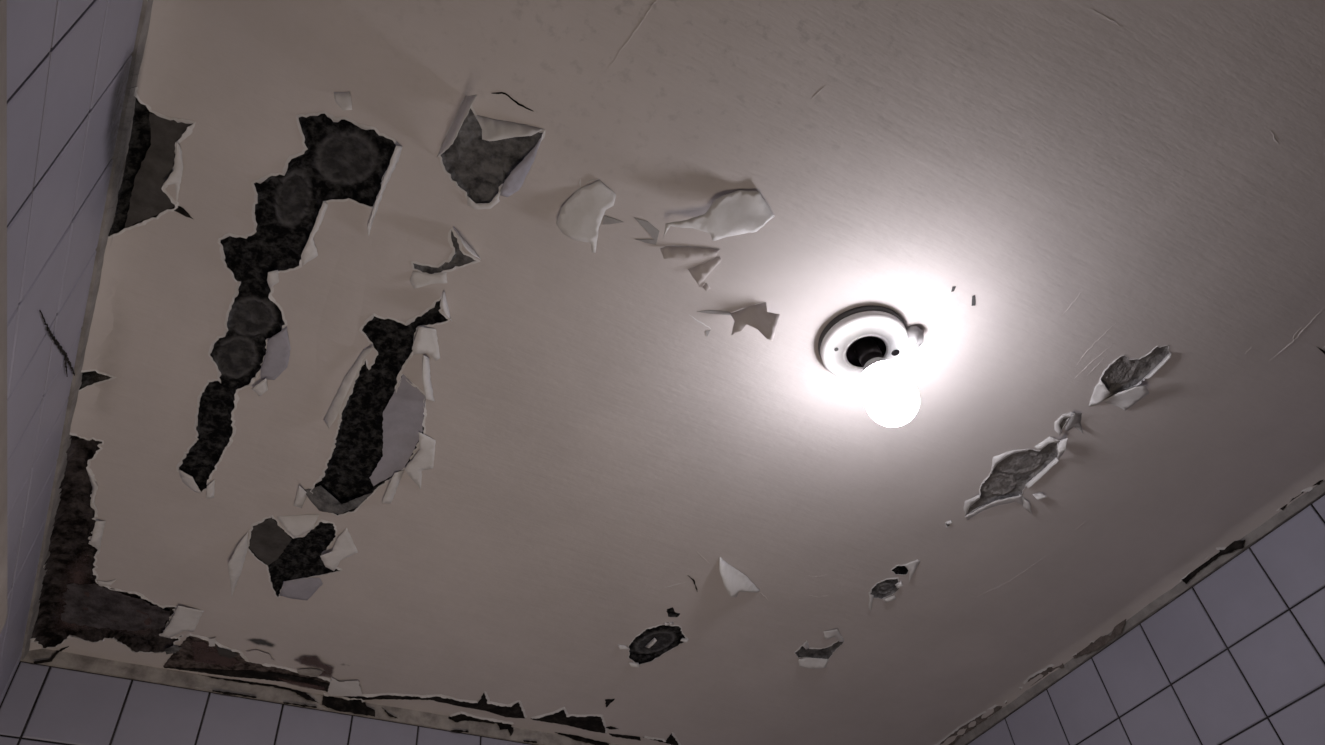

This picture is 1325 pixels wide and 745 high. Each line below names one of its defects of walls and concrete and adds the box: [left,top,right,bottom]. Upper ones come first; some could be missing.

flaking render [108,87,196,238]
peeling [437,95,546,209]
peeling [556,179,774,291]
flaking render [176,92,402,499]
peeling [689,302,780,341]
flaking render [228,227,481,600]
peeling [945,345,1172,528]
flaking render [30,432,204,664]
flaking render [618,607,689,668]
peeling [697,552,769,601]
peeling [794,629,844,669]
peeling [869,560,920,612]